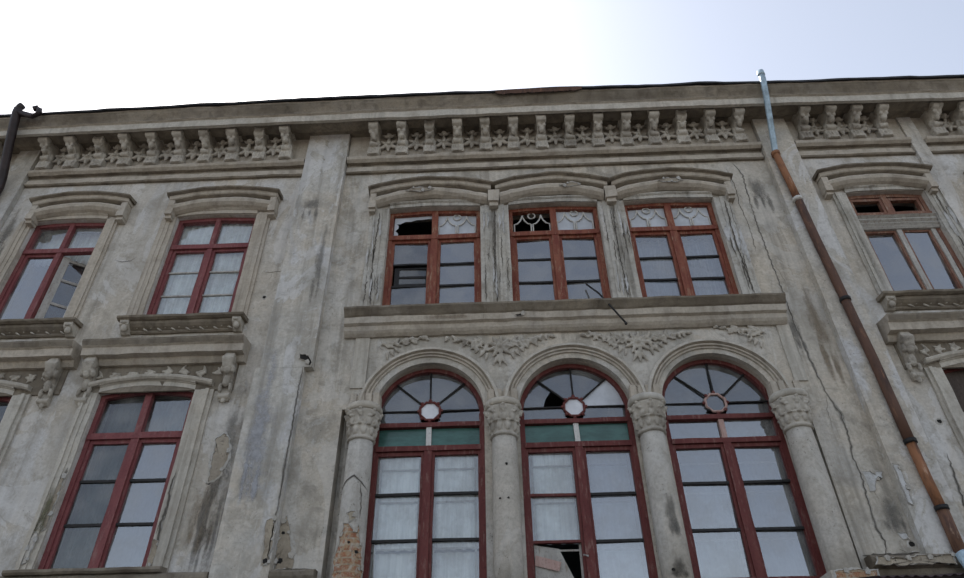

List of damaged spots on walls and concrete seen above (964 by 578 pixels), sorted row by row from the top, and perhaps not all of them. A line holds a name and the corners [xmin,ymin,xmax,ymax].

crack [728,165,920,556]
spalling [206,432,232,485]
spalling [861,463,914,506]
crack [947,455,964,506]
spalling [261,515,295,570]
flaking render [331,510,364,578]